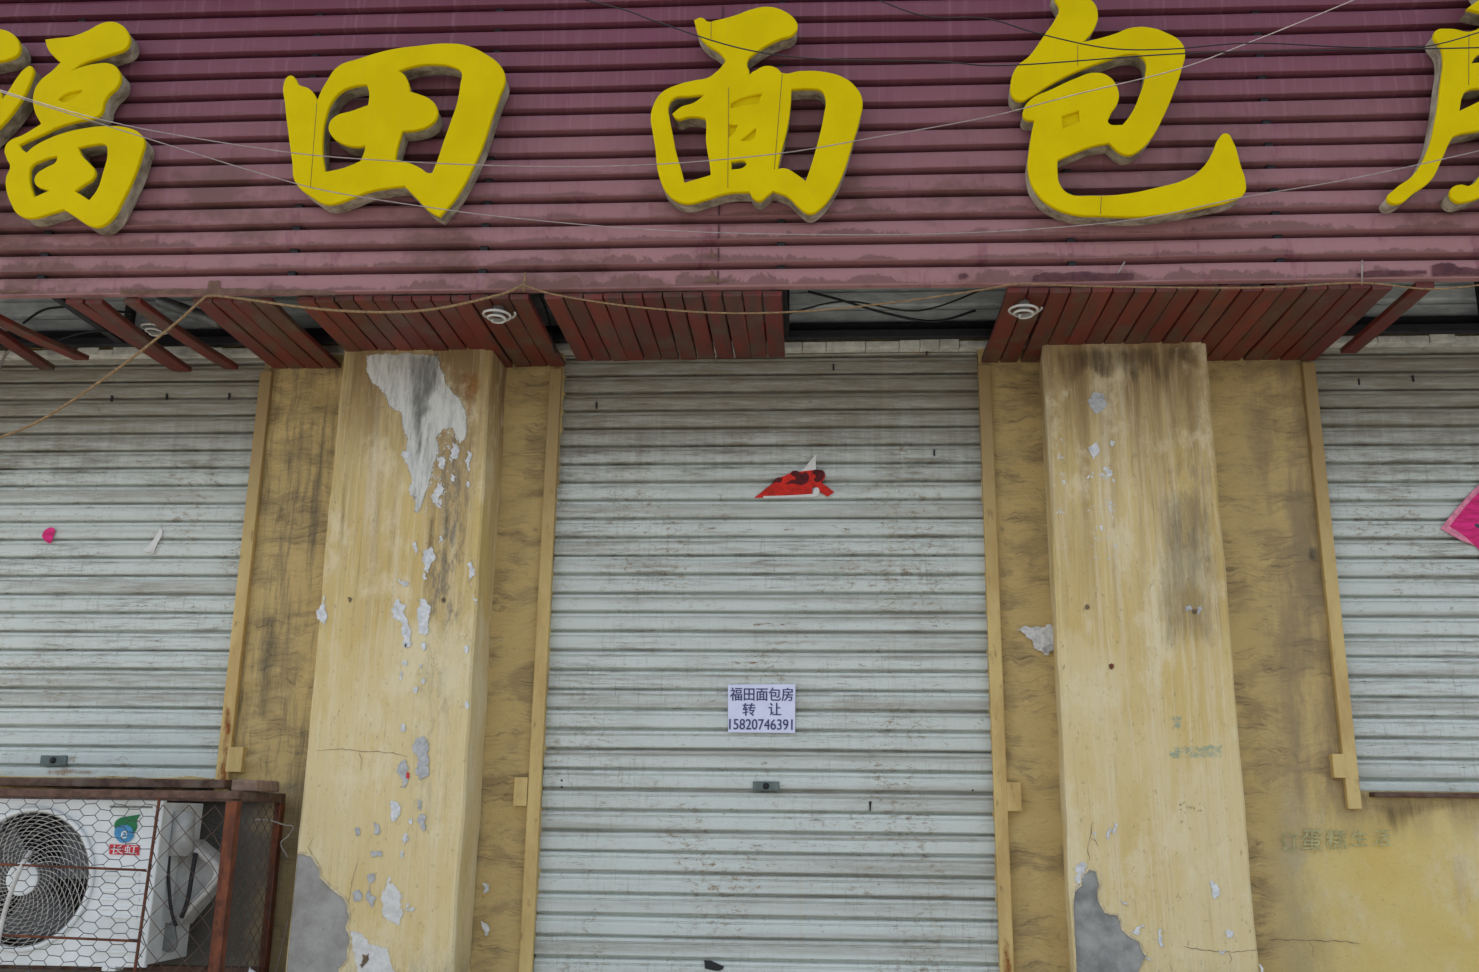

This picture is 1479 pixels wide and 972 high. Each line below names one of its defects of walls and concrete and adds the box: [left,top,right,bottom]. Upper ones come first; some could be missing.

peeling [365,351,472,514]
peeling [1018,624,1054,656]
spalling [286,723,429,972]
spalling [1072,862,1164,972]